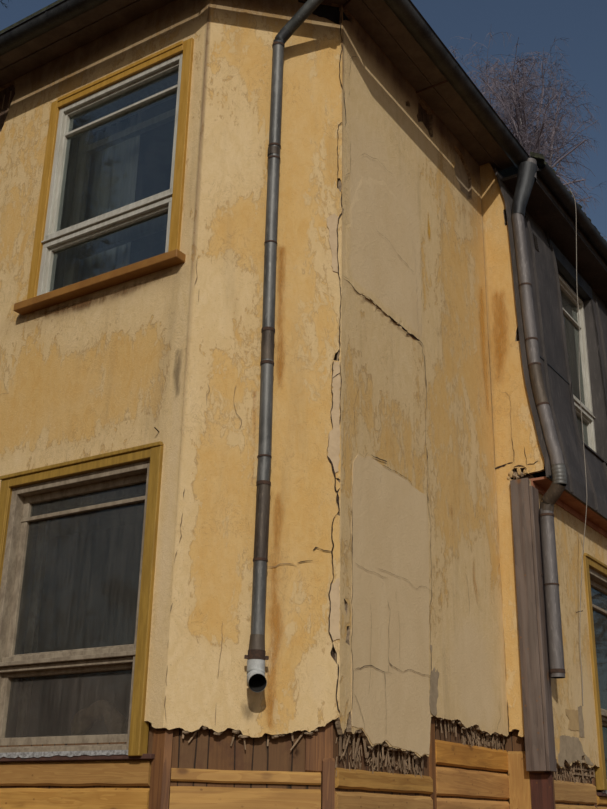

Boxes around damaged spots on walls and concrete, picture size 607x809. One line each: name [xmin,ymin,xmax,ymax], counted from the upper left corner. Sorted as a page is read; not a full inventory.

flaking render [417,103,430,135]
crack [267,15,432,724]
peeling [558,706,594,768]